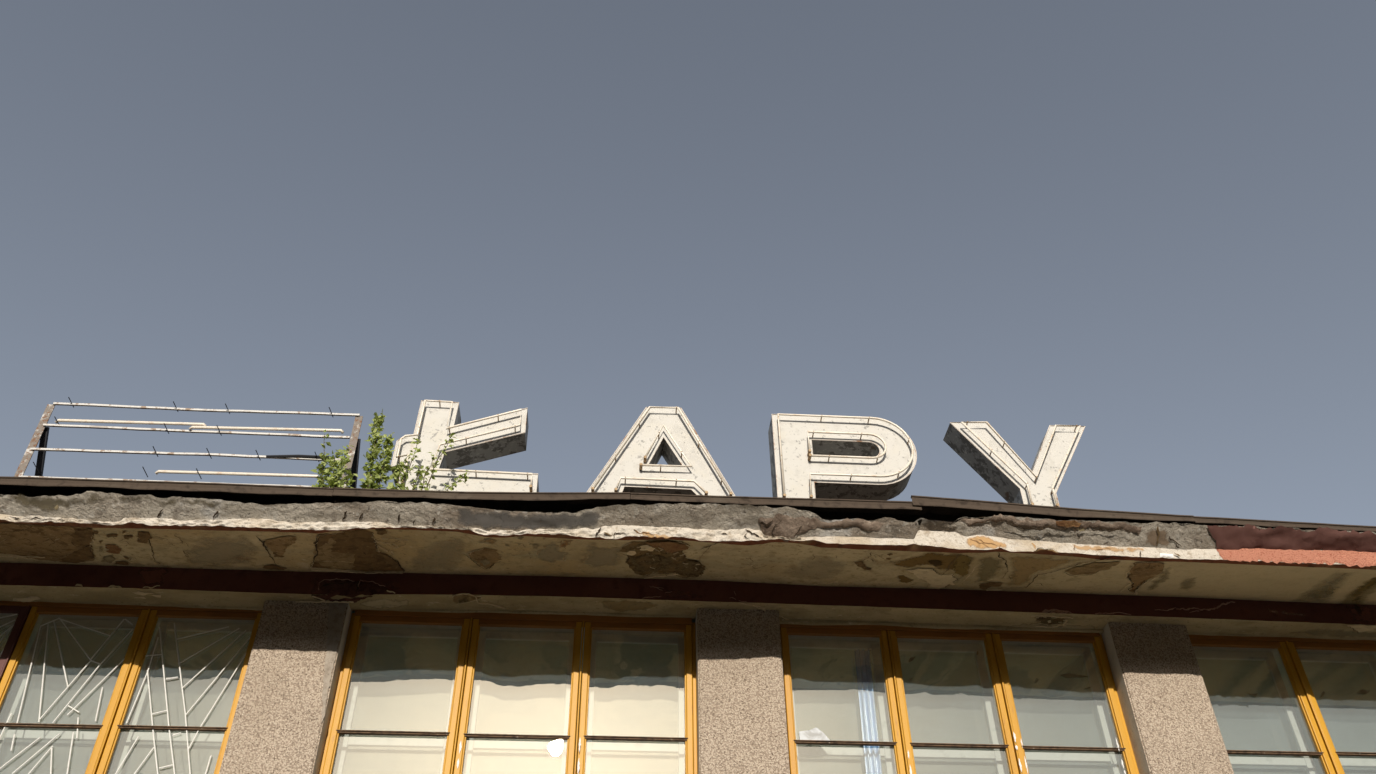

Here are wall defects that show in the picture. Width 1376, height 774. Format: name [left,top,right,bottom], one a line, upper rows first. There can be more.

flaking render [0,523,152,565]
flaking render [295,529,408,603]
flaking render [467,536,546,569]
flaking render [619,540,706,598]
flaking render [758,513,883,542]
flaking render [959,514,1142,535]
flaking render [1100,553,1181,595]